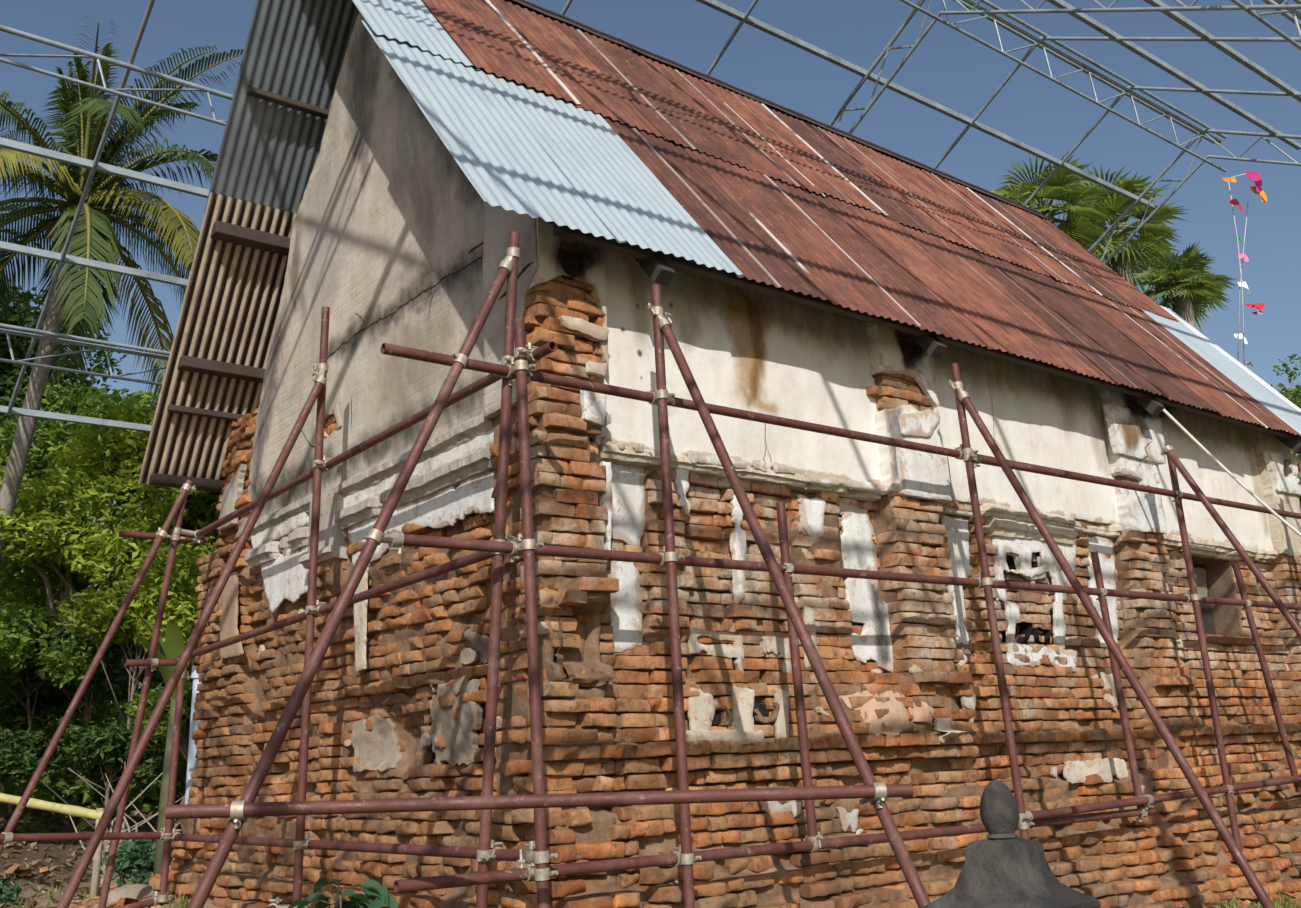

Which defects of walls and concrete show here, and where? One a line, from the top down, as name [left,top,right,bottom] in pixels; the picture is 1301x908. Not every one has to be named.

damp [350,28,375,157]
damp [440,139,483,200]
damp [256,327,281,469]
crack [327,242,483,359]
crack [498,262,533,310]
spalling [517,242,624,438]
rust [727,291,775,467]
peeling [348,471,494,673]
peeling [521,442,645,687]
peeling [675,450,907,673]
peeling [991,532,1119,672]
peeling [685,628,789,745]